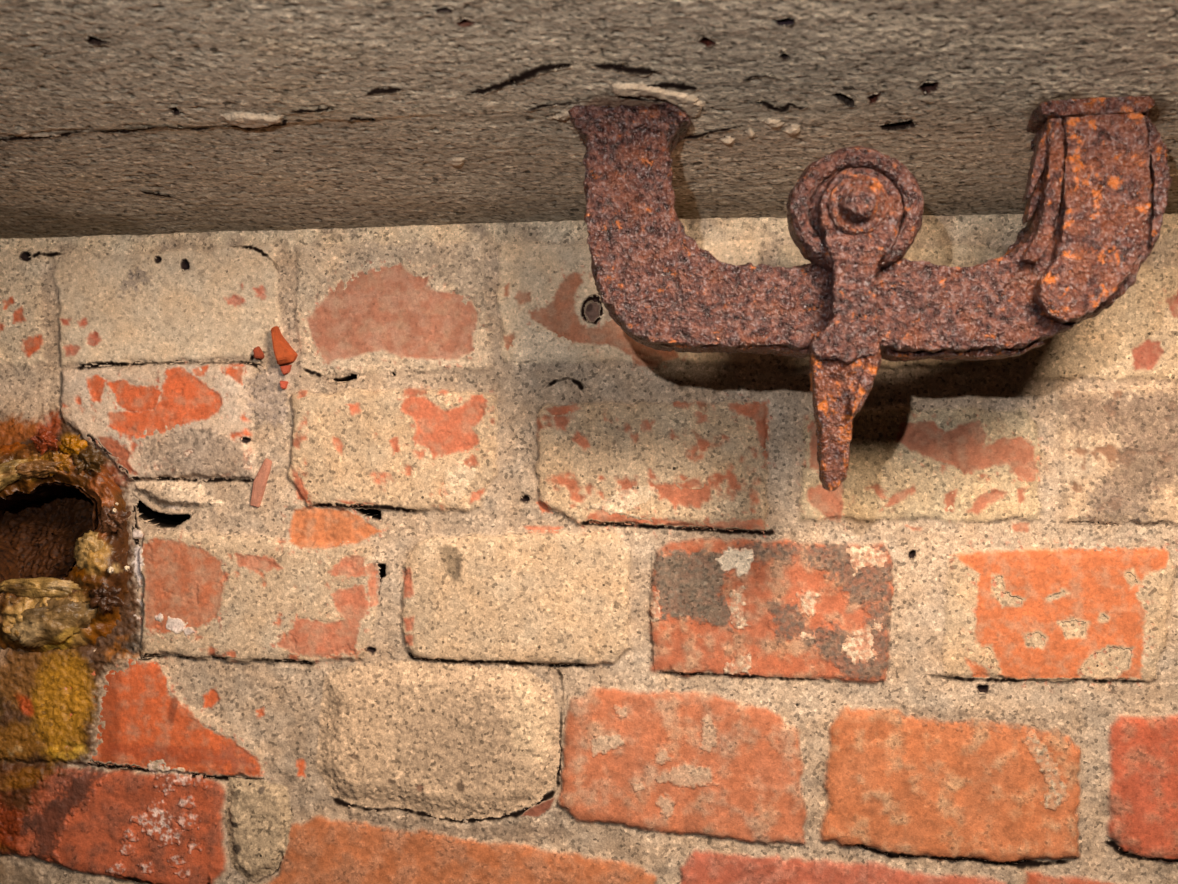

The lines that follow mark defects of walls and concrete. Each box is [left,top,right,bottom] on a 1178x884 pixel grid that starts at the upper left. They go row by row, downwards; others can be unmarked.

crack [0,87,405,142]
crack [467,62,809,140]
rust [1014,80,1178,324]
rust [811,356,828,427]
rust [847,350,879,415]
leakage [74,530,104,569]
leakage [0,577,98,649]
rust [0,398,150,884]